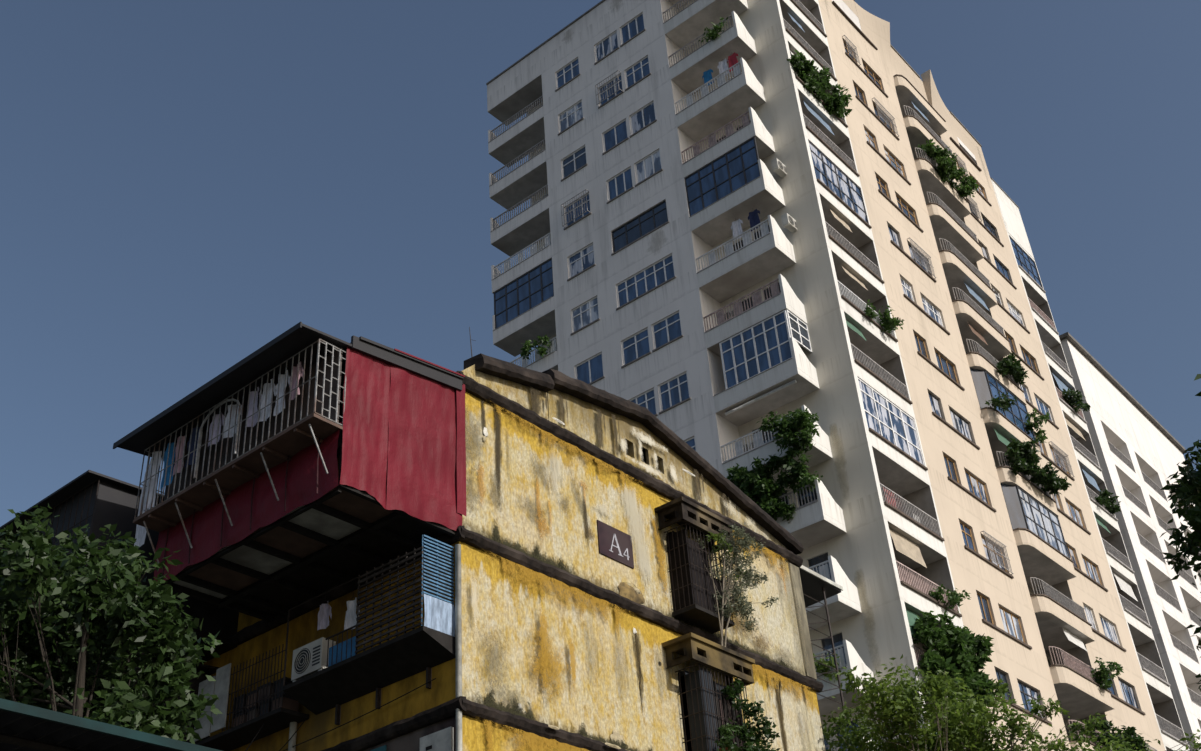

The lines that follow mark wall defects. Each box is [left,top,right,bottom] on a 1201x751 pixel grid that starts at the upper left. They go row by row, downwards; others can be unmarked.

water stain [468,386,668,593]
water stain [733,533,786,572]
water stain [495,555,624,697]
water stain [731,613,811,701]
water stain [484,720,589,751]